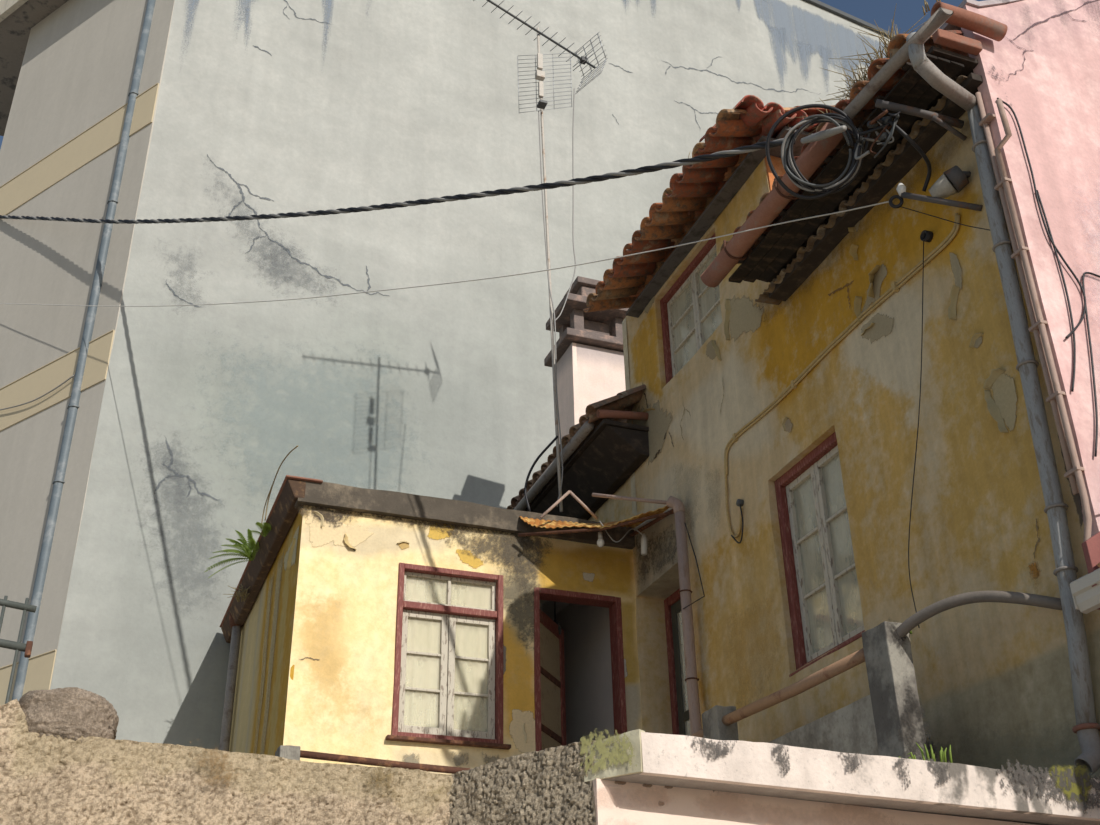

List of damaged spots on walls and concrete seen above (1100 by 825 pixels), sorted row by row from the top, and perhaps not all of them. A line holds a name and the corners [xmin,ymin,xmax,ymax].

crack [663,57,821,94]
water stain [754,0,886,87]
crack [1007,0,1096,79]
crack [207,154,389,296]
peeling [706,295,763,361]
peeling [854,264,893,343]
crack [154,437,217,500]
water stain [300,504,549,596]
peeling [428,524,453,540]
peeling [456,549,483,568]
water stain [773,744,790,775]
water stain [840,752,862,772]